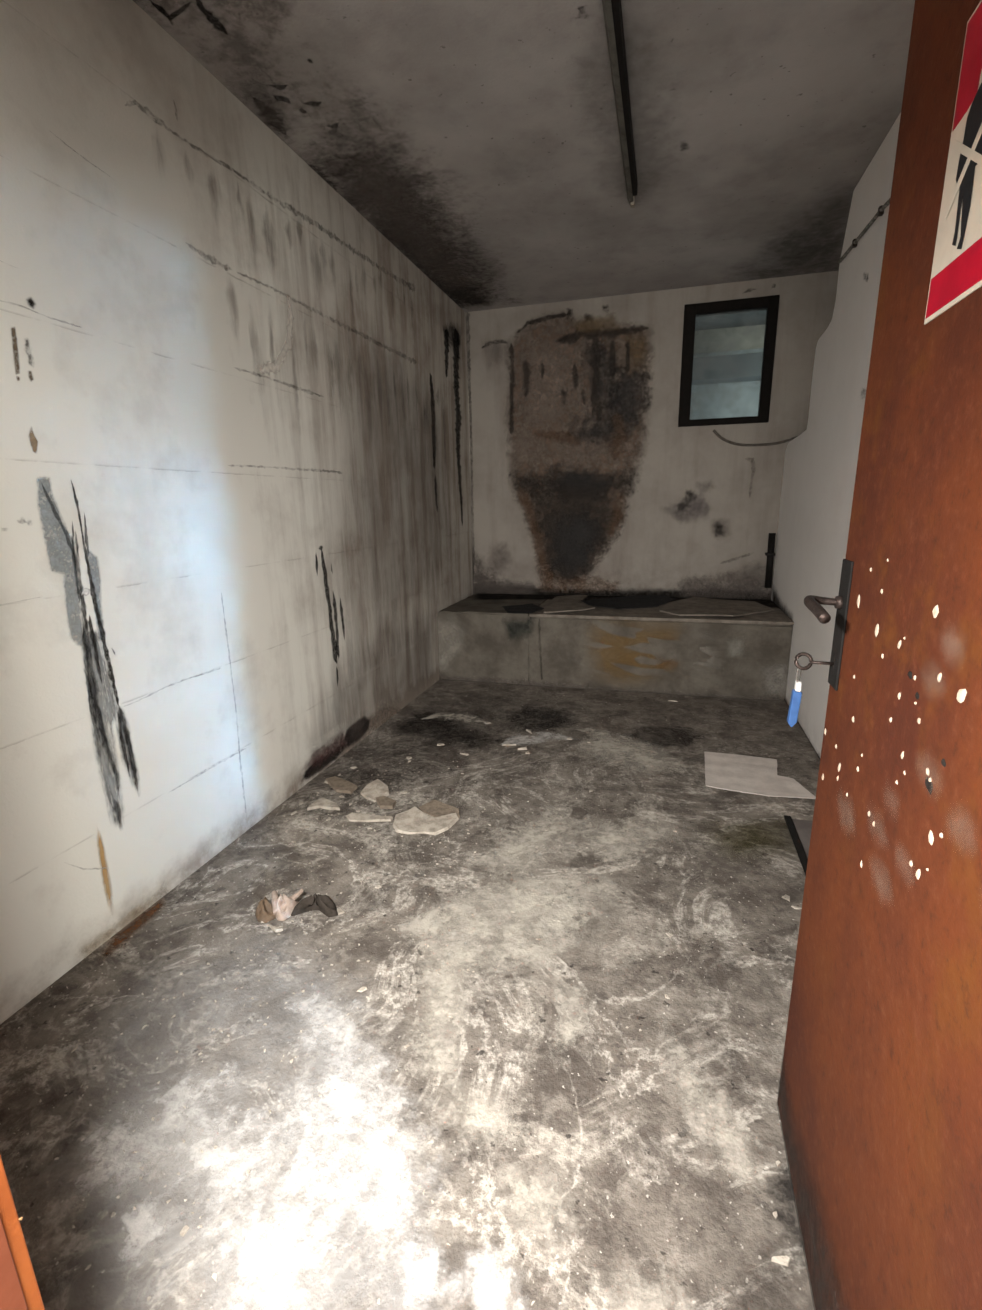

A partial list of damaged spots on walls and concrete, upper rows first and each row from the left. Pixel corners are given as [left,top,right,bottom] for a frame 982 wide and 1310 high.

damp [218,0,321,134]
damp [309,120,501,306]
damp [473,306,792,620]
peeling [38,478,138,827]